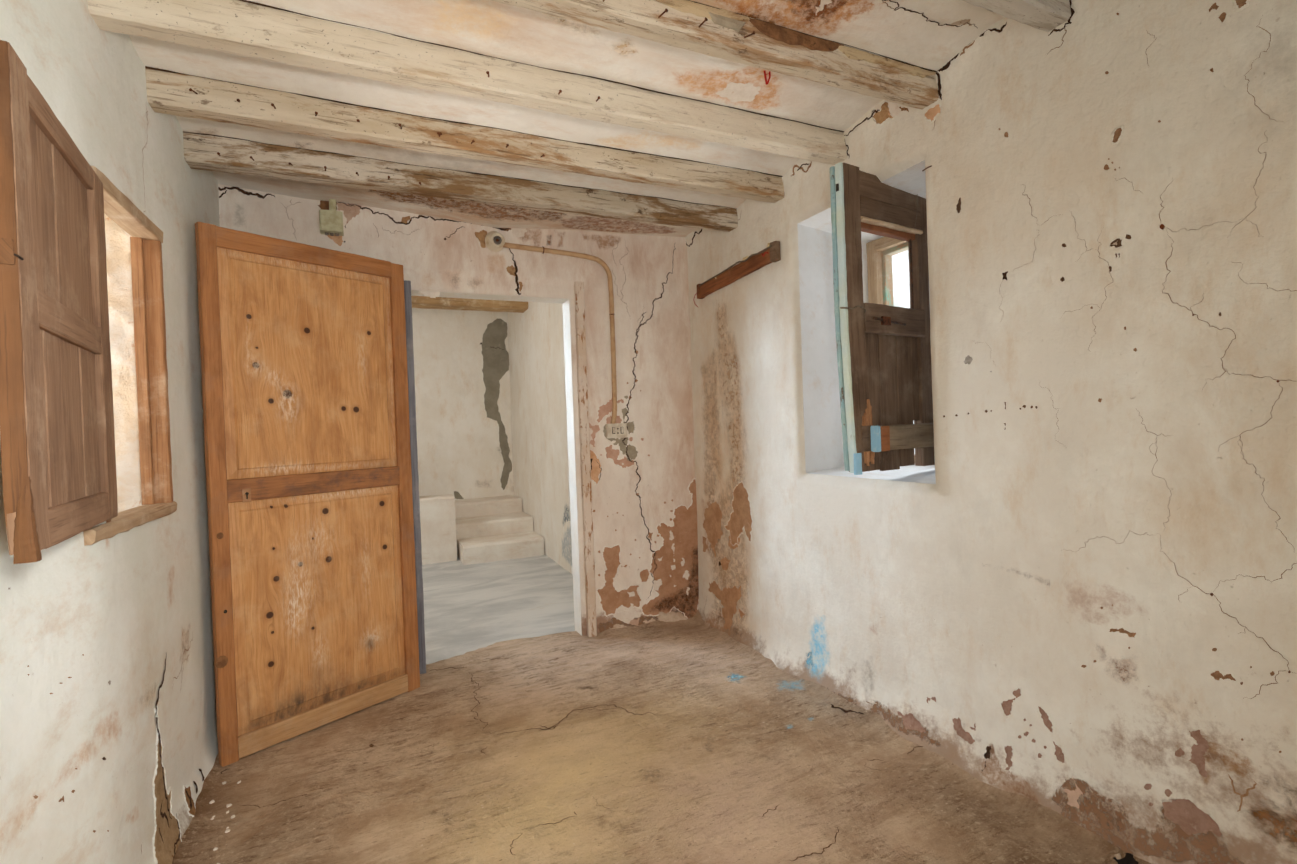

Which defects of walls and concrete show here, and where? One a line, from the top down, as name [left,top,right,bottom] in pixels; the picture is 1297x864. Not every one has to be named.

crack [145,66,812,195]
crack [239,0,880,156]
water stain [663,59,792,115]
crack [183,131,741,597]
flaking render [593,478,753,647]
water stain [1050,568,1162,642]
crack [152,633,193,864]
flaking render [828,689,940,746]
flaking render [952,688,1243,864]
spalling [1211,671,1243,685]
water stain [1180,721,1297,844]
water stain [1263,652,1297,697]